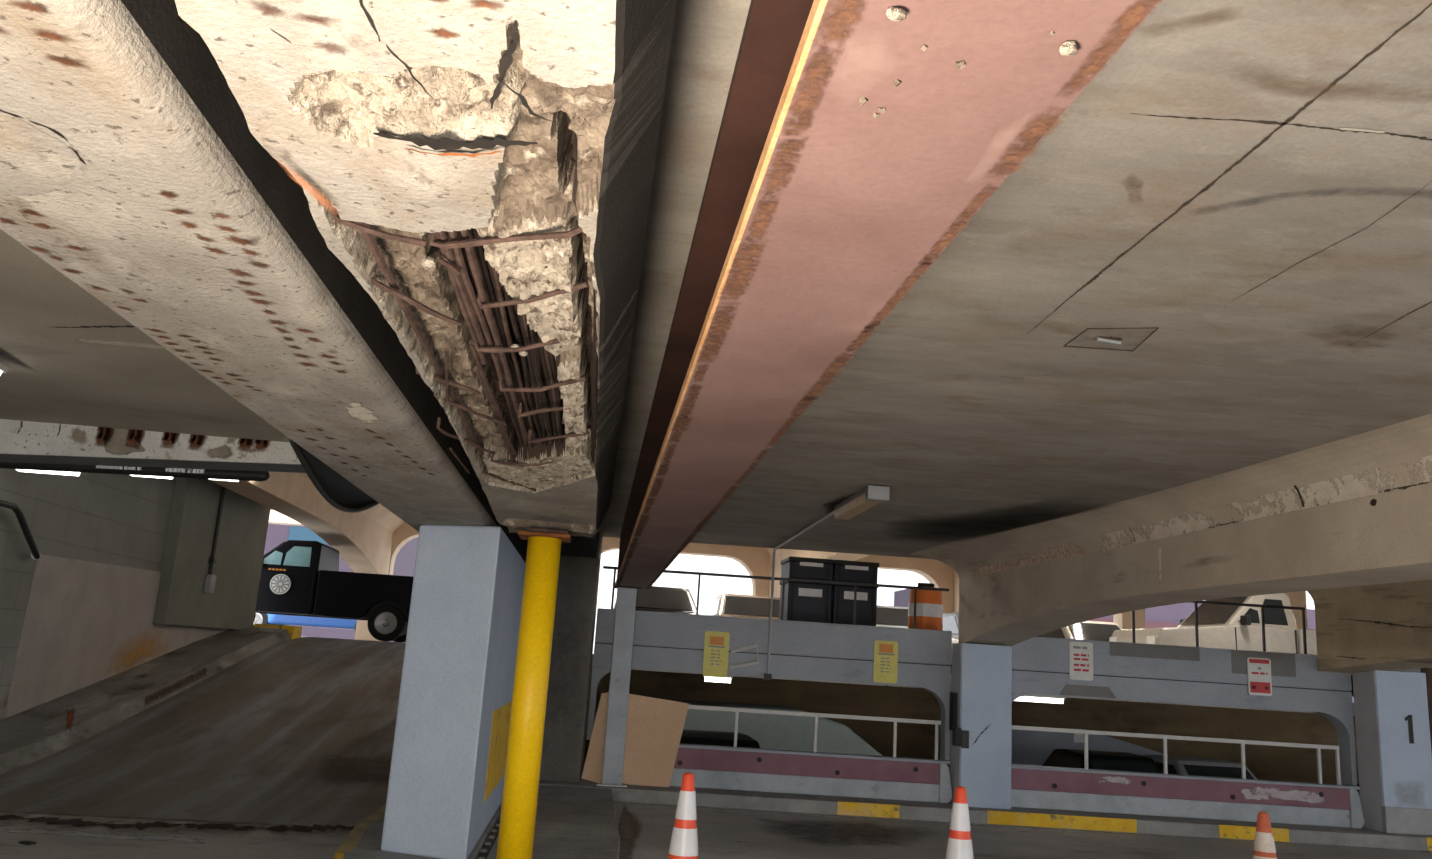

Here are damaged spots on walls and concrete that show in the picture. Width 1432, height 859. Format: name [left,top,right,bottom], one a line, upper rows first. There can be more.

crack [0,110,85,164]
rust [34,31,82,67]
crack [359,0,435,101]
rust [432,29,456,38]
crack [373,21,554,157]
crack [1131,113,1432,141]
rust [292,174,329,207]
rust [159,191,346,373]
spalling [286,22,615,493]
rust [648,116,1060,589]
rust [162,432,206,449]
peeling [1101,455,1432,550]